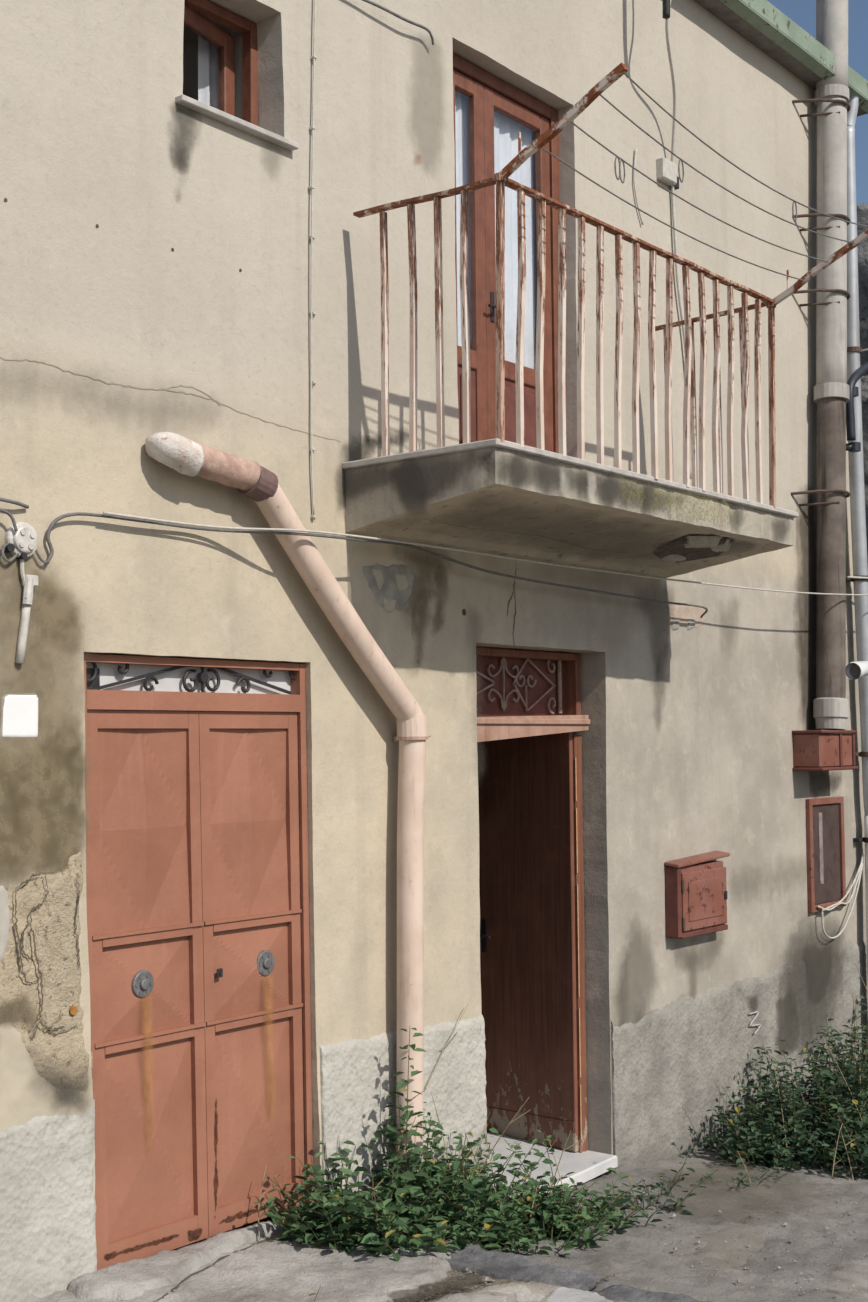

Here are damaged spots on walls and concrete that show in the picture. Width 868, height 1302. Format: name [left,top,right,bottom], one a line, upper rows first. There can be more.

damp [175,109,193,165]
crack [1,357,336,440]
damp [340,434,668,517]
peeling [362,563,415,613]
spalling [654,536,734,563]
damp [0,561,81,875]
peeling [0,851,93,1092]
damp [779,930,841,1050]
corrosion [104,1228,202,1260]